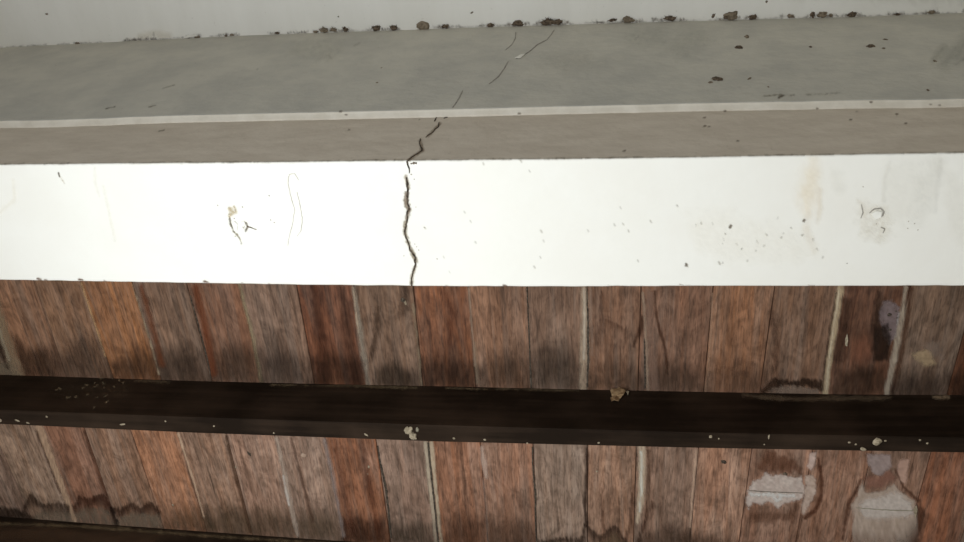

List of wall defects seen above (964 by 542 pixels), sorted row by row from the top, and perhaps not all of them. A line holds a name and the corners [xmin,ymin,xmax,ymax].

crack [489,22,568,84]
crack [403,90,463,286]
water stain [0,426,160,527]
water stain [549,452,626,542]
peeling [746,453,823,521]
peeling [843,454,920,540]